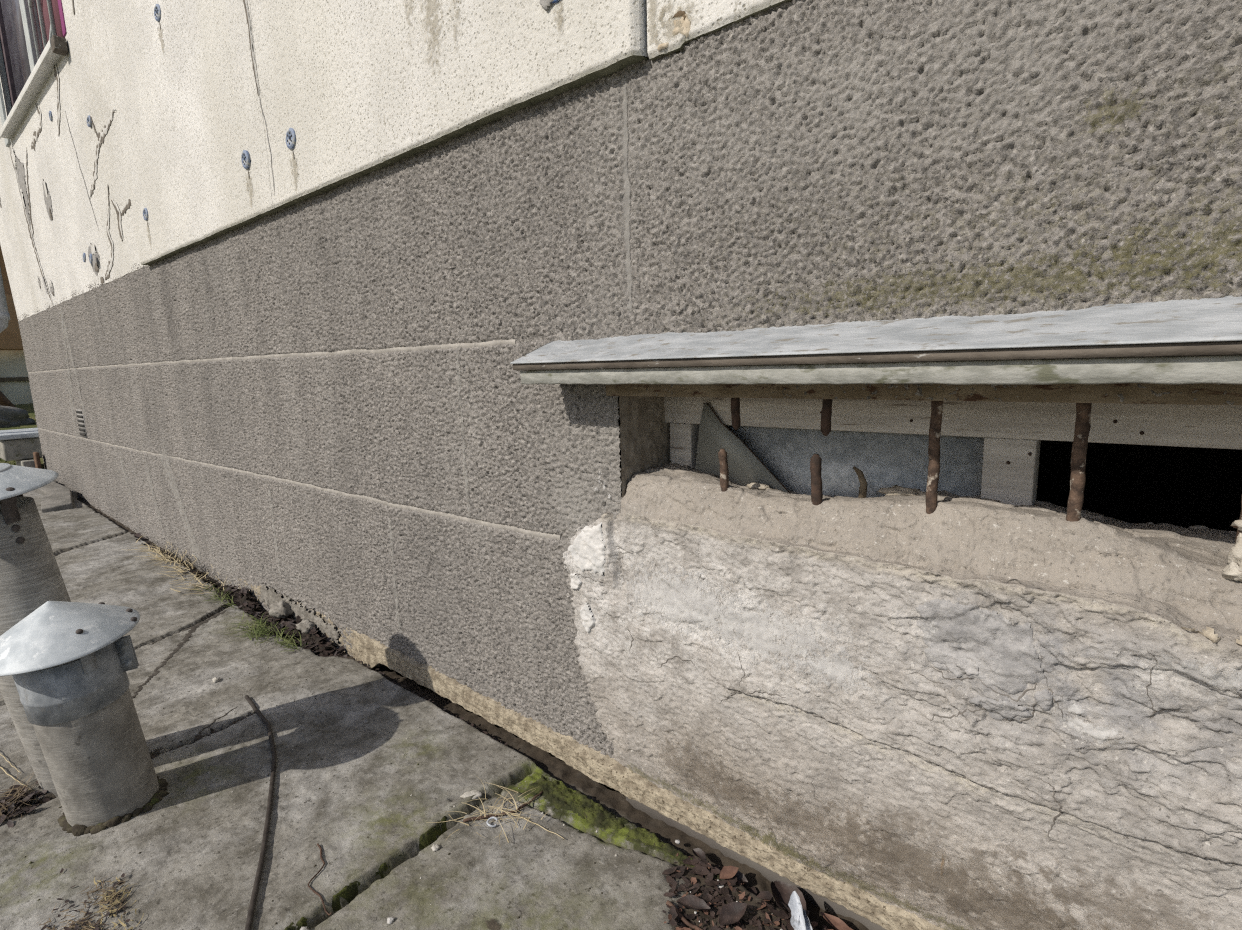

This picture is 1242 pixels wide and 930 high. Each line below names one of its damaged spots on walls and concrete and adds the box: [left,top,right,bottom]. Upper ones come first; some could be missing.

crack [243,0,275,196]
crack [9,63,131,305]
crack [993,579,1046,613]
crack [911,662,1066,722]
crack [1146,612,1184,719]
crack [1041,779,1063,838]
crack [1144,840,1238,867]